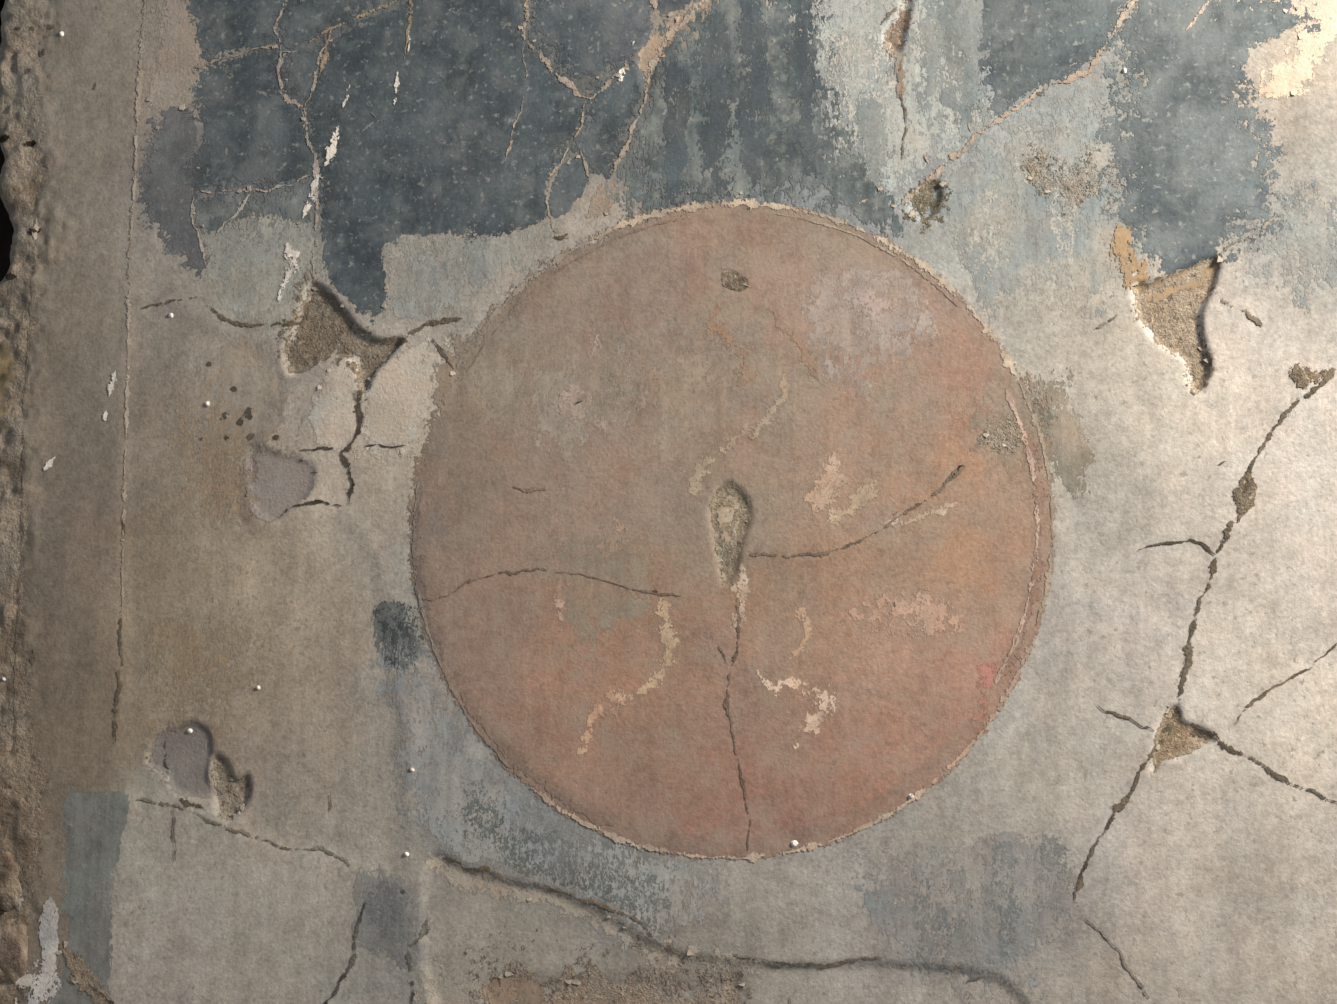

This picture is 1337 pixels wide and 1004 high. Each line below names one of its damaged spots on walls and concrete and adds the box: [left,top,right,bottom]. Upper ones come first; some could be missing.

crack [142,0,413,328]
peeling [134,0,952,522]
crack [505,0,708,240]
crack [897,0,1136,206]
peeling [976,0,1337,395]
spalling [0,0,75,1004]
flaking render [142,716,252,820]
crack [137,741,350,866]
flaking render [405,852,774,1004]
flaking render [709,481,753,585]
crack [718,465,966,851]
crack [1074,363,1337,1004]